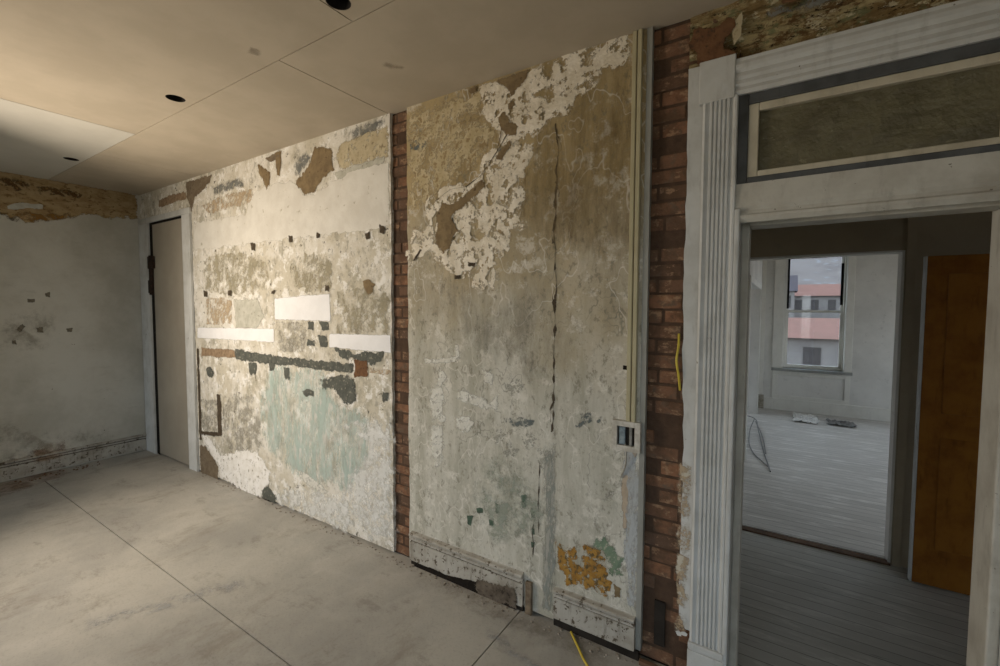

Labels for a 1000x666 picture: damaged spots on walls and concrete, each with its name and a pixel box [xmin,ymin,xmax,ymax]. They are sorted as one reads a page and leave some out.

peeling [0,171,138,223]
spalling [159,175,253,213]
spalling [258,151,281,189]
peeling [203,243,268,329]
peeling [278,35,630,557]
peeling [197,348,277,503]